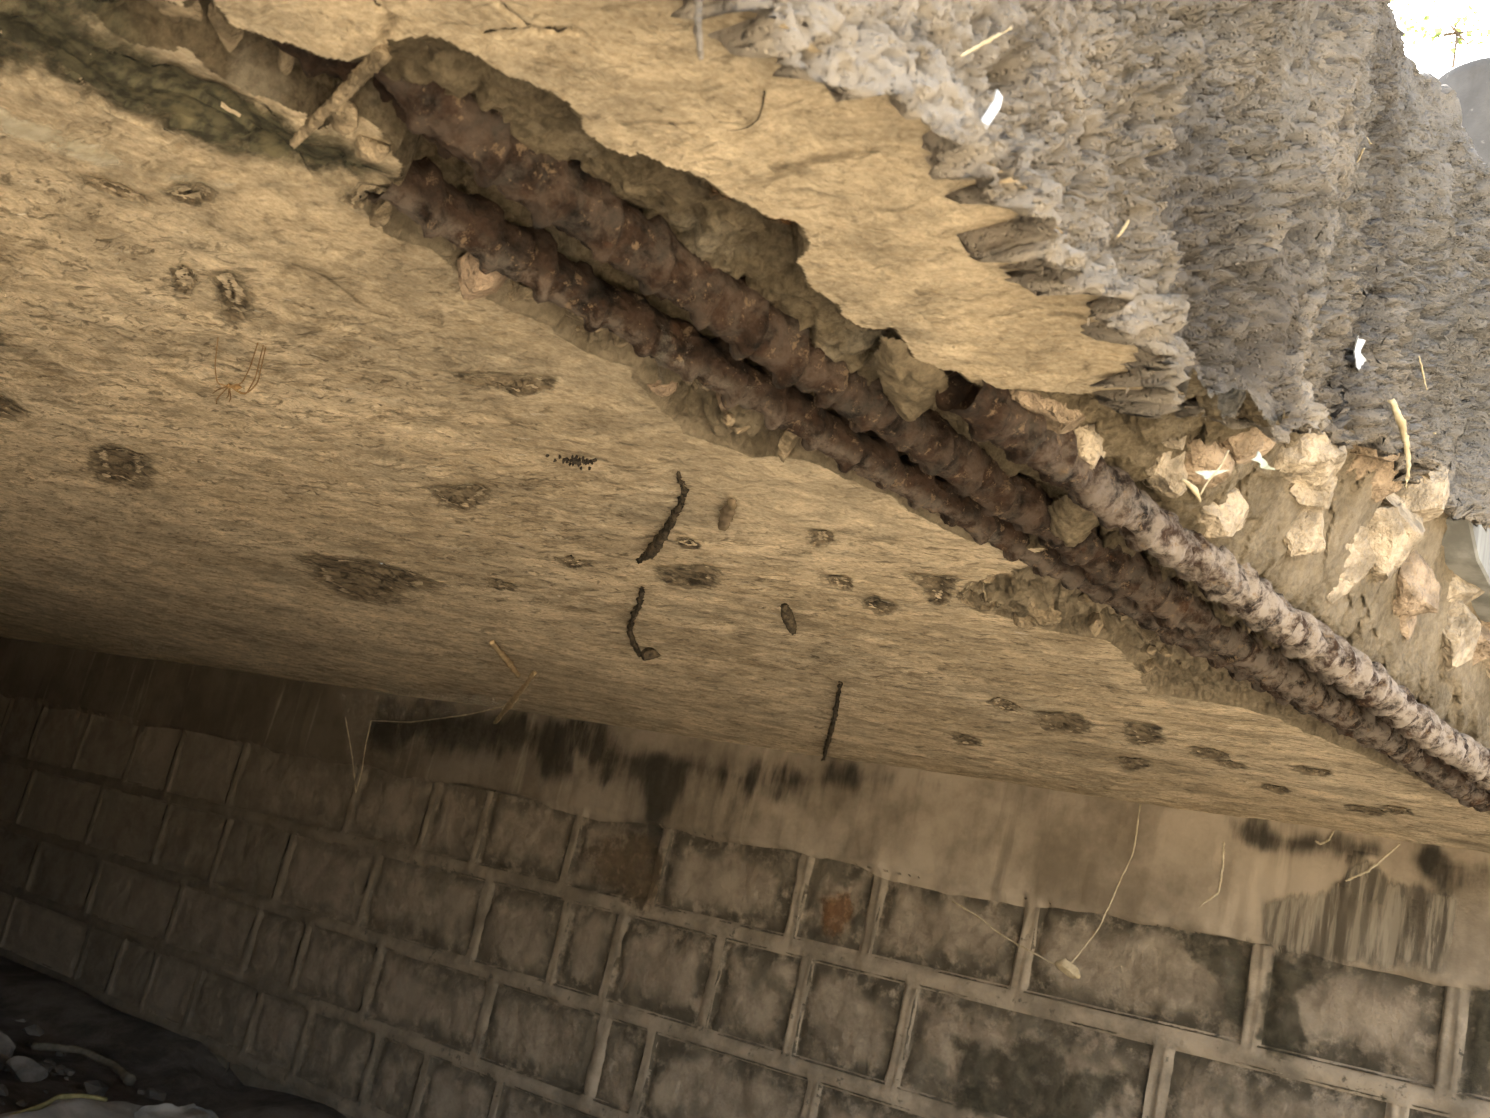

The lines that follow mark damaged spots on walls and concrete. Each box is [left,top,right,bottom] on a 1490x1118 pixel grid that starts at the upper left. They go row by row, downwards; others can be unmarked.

crack [484,3,577,33]
spalling [81,0,1490,816]
leakage [369,698,691,910]
leakage [745,761,800,798]
leakage [825,763,861,789]
leakage [1243,818,1462,973]